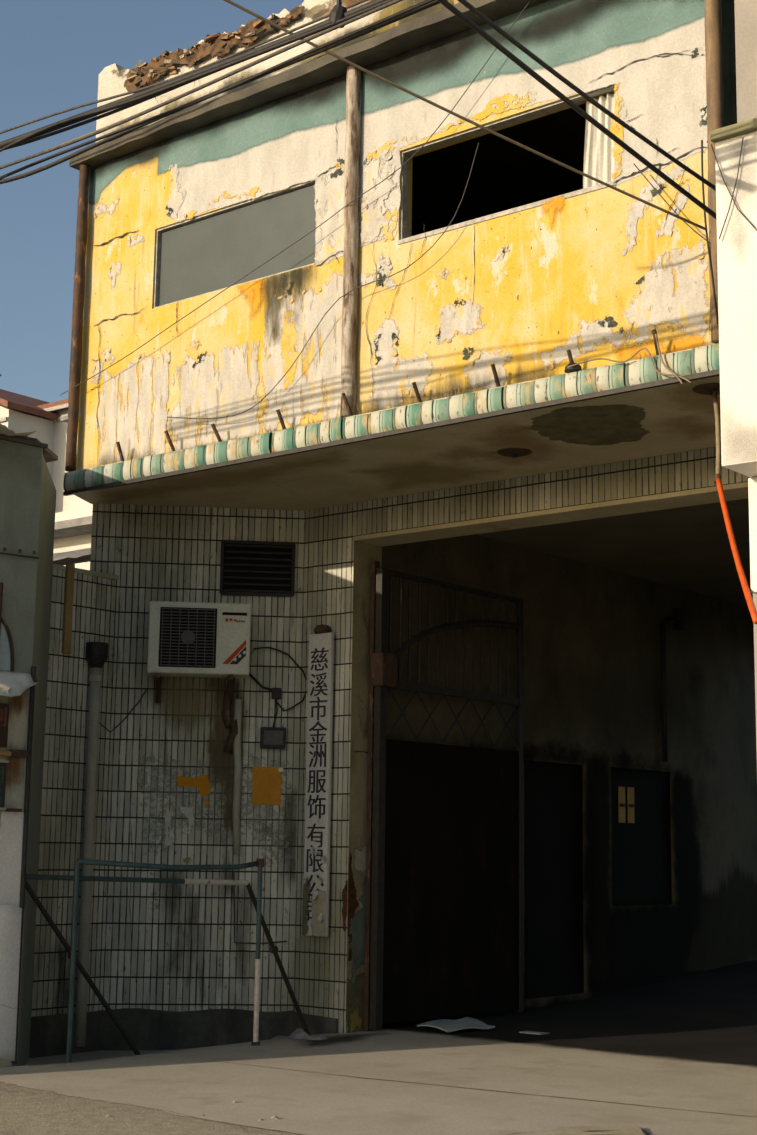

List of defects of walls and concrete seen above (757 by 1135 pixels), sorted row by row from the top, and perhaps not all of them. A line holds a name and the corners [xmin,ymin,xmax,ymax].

spalling [124,4,306,92]
peeling [441,92,536,130]
peeling [90,158,345,466]
leakage [260,265,311,338]
peeling [358,136,417,291]
peeling [369,298,513,410]
peeling [539,160,710,372]